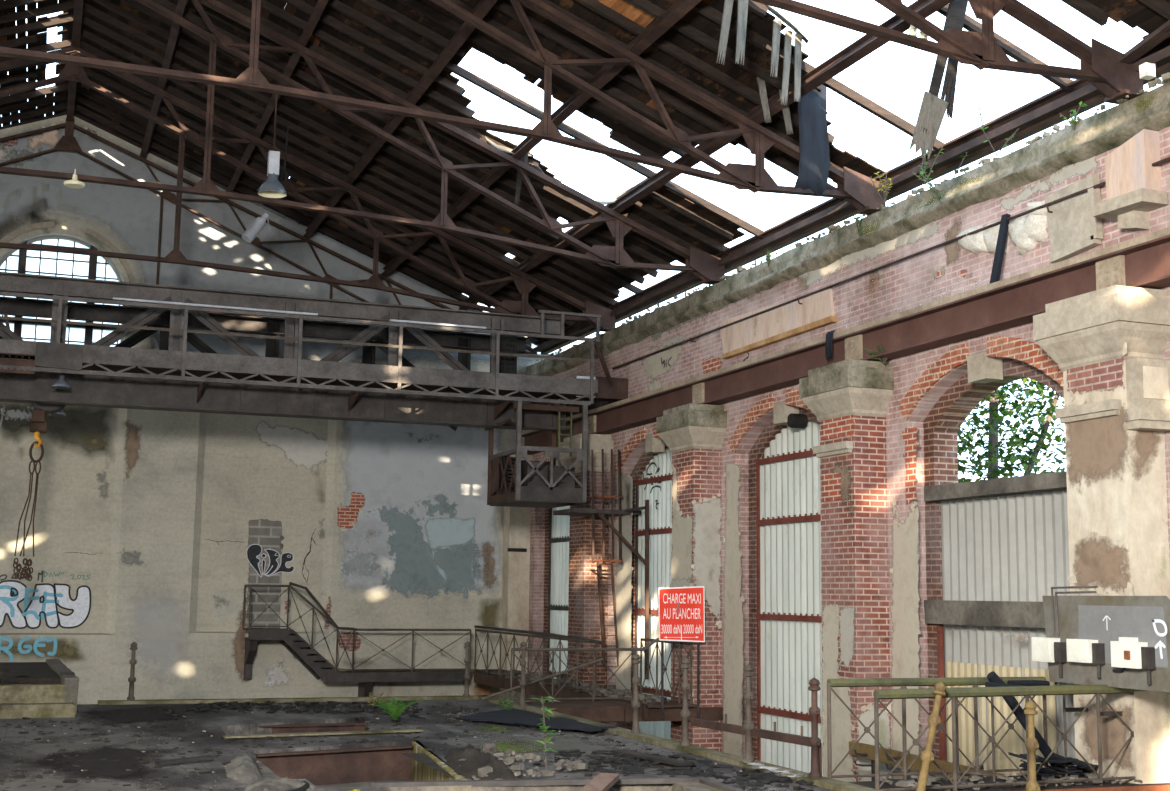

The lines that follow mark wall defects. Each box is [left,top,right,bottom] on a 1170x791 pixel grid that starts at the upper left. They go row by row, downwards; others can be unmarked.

peeling [256,422,328,471]
peeling [337,492,481,599]
peeling [1067,525,1134,596]
peeling [670,462,803,777]